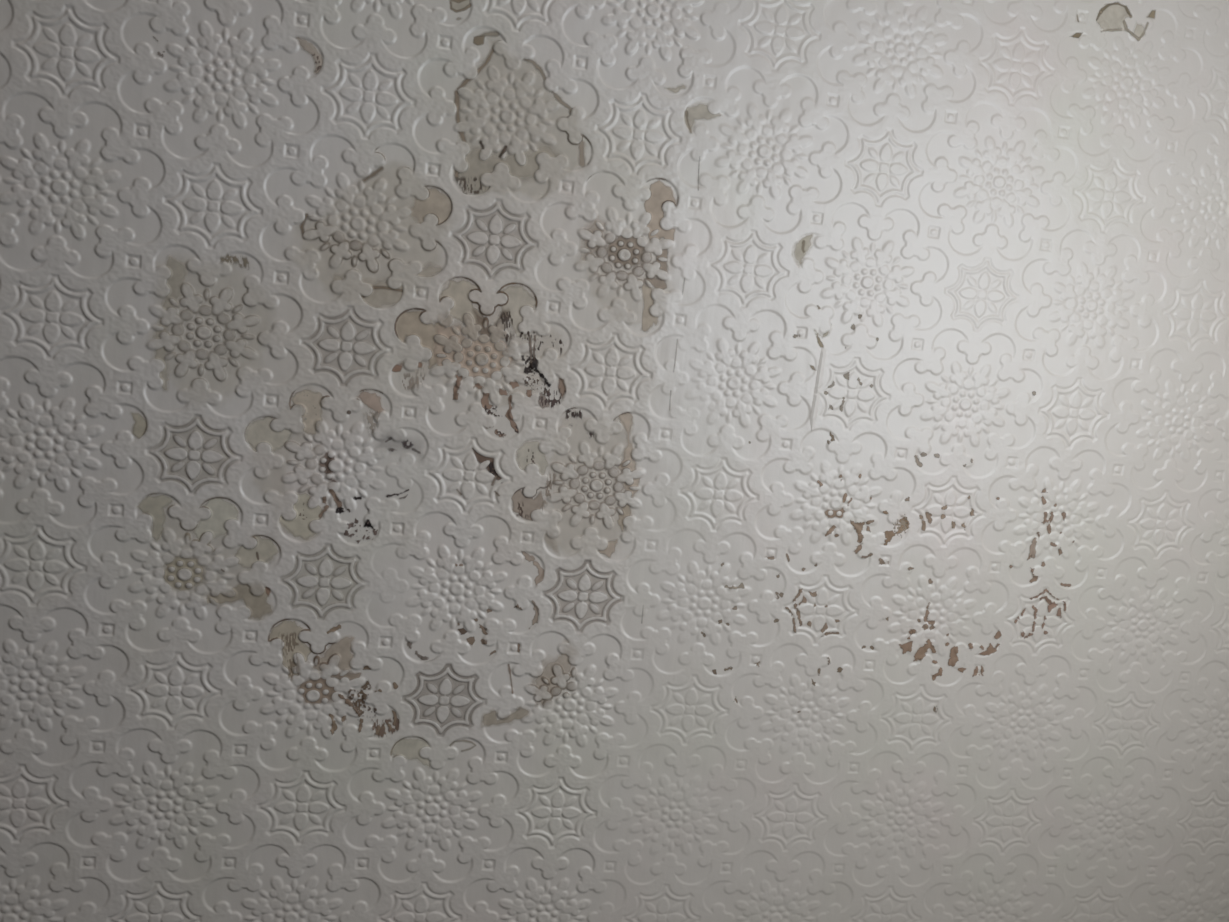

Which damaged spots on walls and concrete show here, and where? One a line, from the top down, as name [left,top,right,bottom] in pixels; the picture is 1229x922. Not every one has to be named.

peeling [825,493,974,565]
peeling [1014,489,1074,638]
peeling [458,609,496,656]
peeling [774,575,840,635]
peeling [899,603,1002,681]
peeling [329,666,399,737]